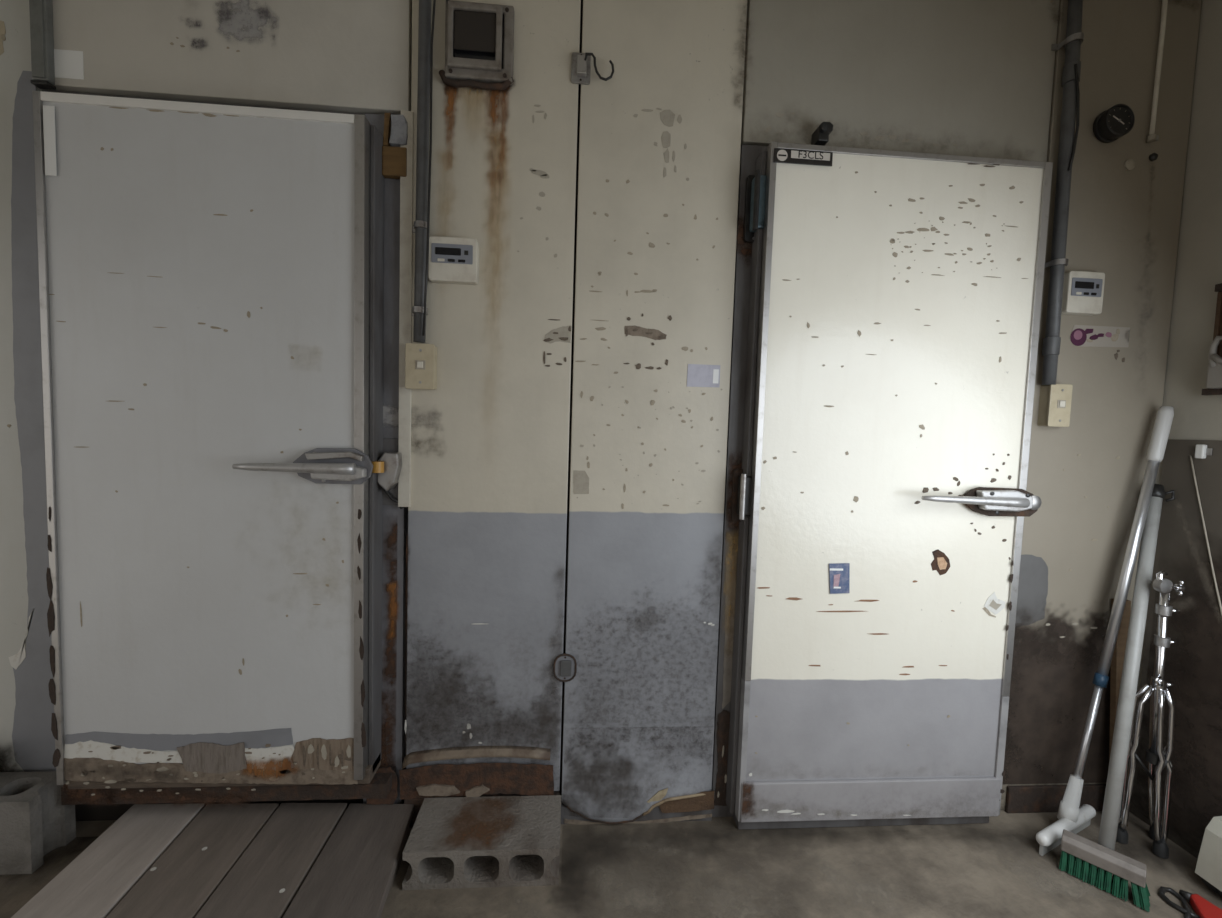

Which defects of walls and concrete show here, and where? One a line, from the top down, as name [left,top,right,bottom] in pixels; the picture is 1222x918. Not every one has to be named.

mould [218,0,276,52]
rust [439,70,514,169]
peeling [9,609,34,669]
rust [46,567,60,767]
rust [367,523,554,805]
rust [714,456,742,806]
rust [931,549,950,575]
water stain [1002,614,1111,784]
water stain [1143,558,1222,833]